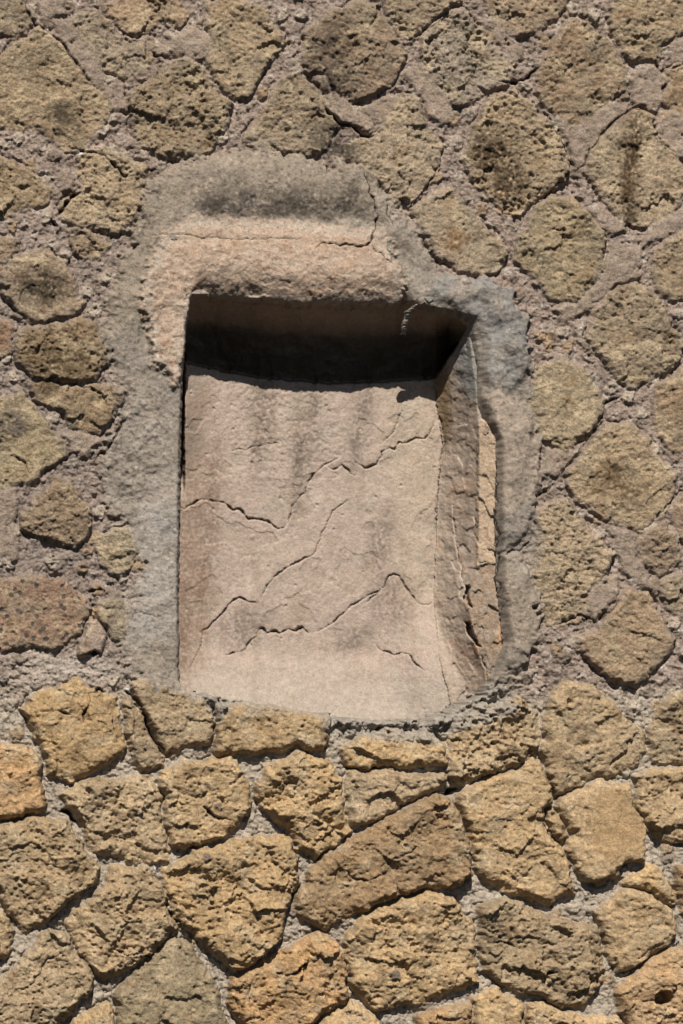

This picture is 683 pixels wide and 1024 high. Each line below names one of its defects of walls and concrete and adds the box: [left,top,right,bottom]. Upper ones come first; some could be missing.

leakage [475,135,522,196]
leakage [621,126,642,222]
crack [185,394,466,588]
crack [191,502,345,665]
crack [227,574,426,655]